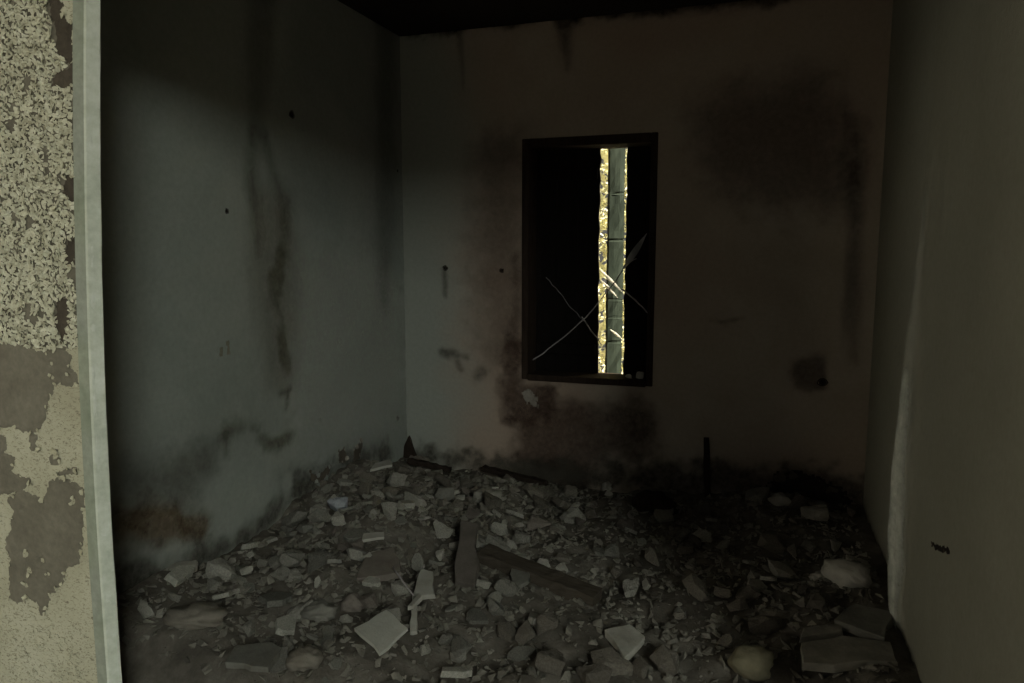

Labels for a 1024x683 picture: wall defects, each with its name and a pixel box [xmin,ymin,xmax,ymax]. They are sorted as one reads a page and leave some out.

peeling [0,0,86,616]
damp [191,477,316,564]
damp [115,563,161,594]